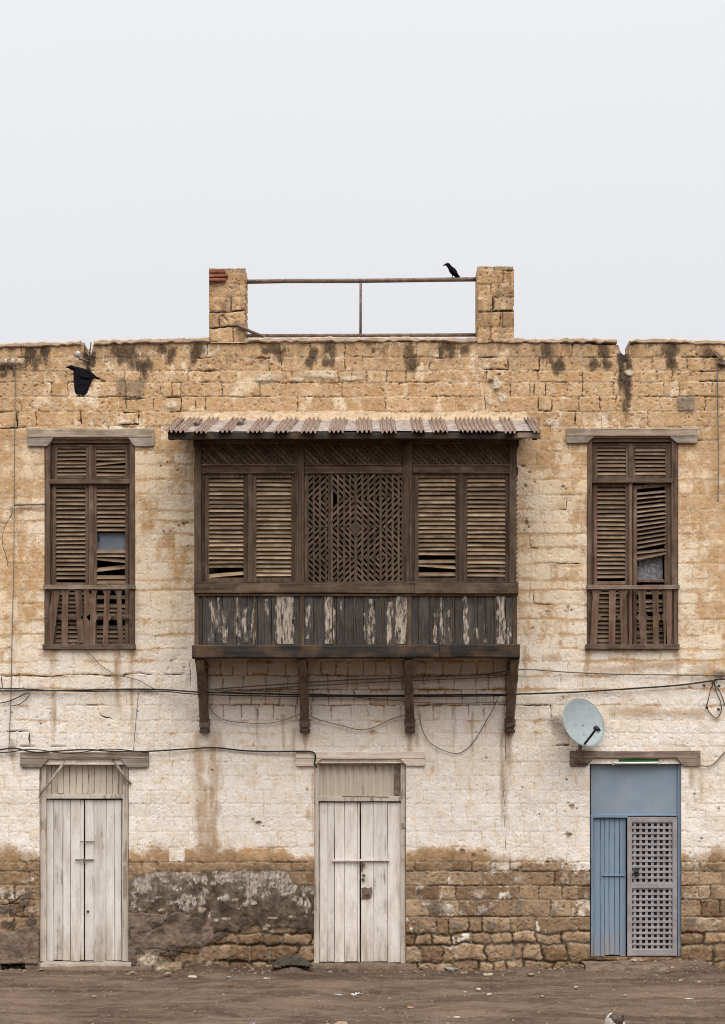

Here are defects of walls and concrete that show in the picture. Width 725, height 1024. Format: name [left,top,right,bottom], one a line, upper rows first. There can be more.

leakage [25,346,50,371]
leakage [83,351,96,371]
leakage [112,345,176,380]
leakage [190,343,204,364]
leakage [305,342,335,368]
leakage [403,344,417,371]
leakage [437,342,469,358]
leakage [541,344,565,375]
leakage [662,344,678,368]
leakage [589,345,631,412]
peeling [416,883,496,929]
peeling [0,877,39,966]